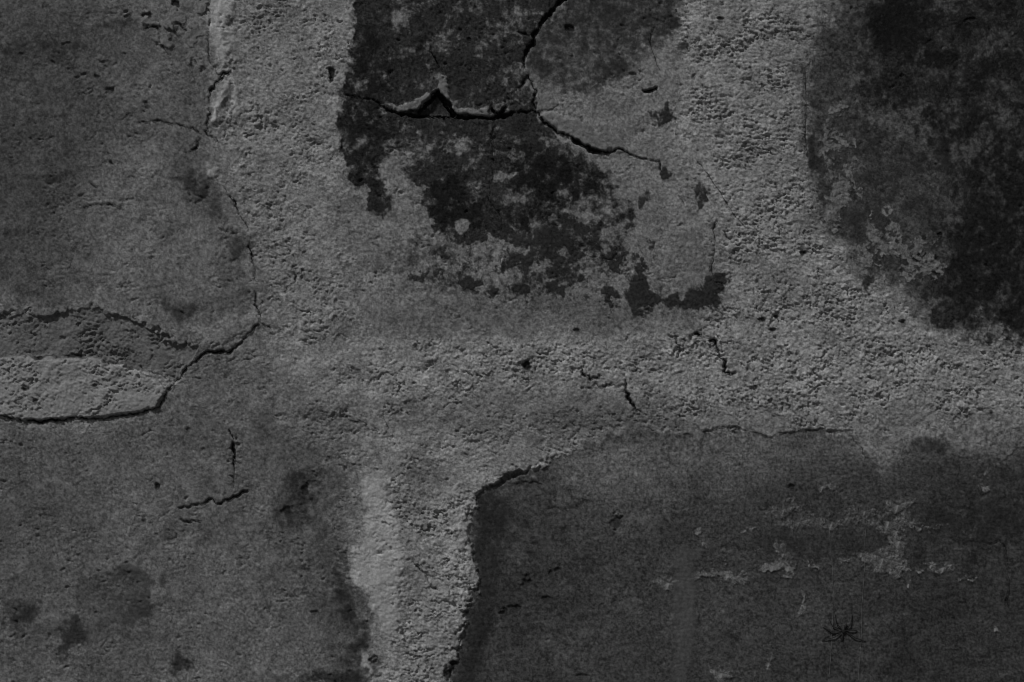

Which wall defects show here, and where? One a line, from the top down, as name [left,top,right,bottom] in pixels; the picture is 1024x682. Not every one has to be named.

crack [142,4,235,153]
crack [347,0,661,227]
damp [335,0,689,272]
damp [806,0,1024,346]
crack [3,188,270,423]
crack [180,430,248,523]
damp [302,473,404,682]